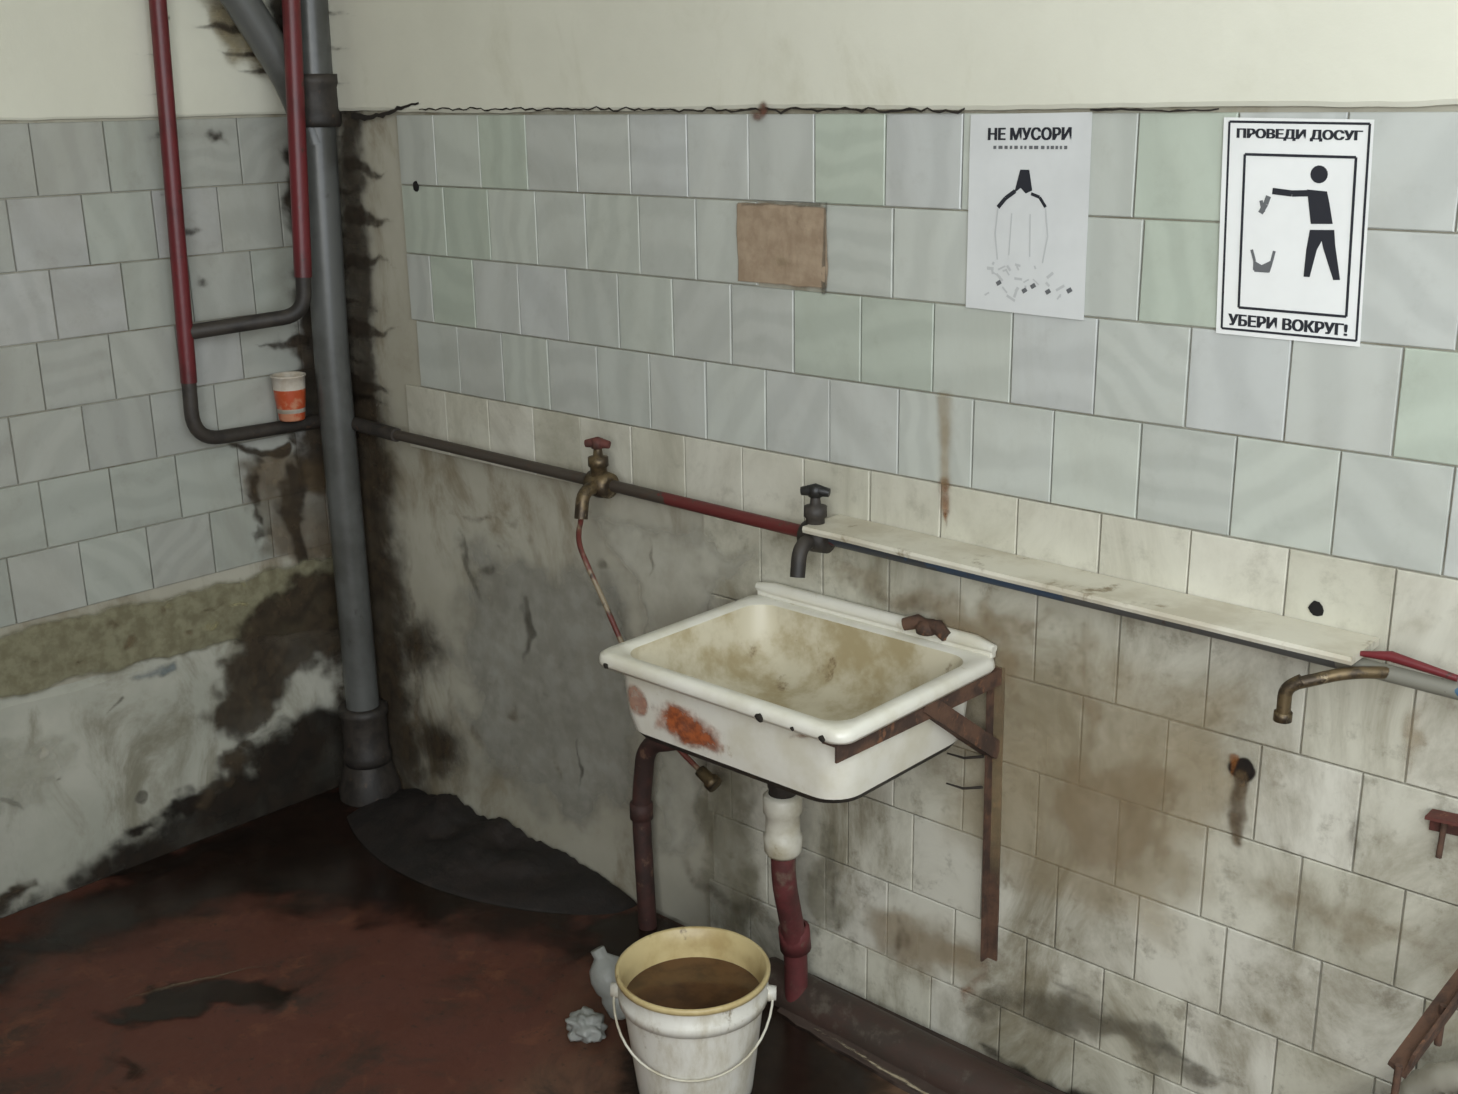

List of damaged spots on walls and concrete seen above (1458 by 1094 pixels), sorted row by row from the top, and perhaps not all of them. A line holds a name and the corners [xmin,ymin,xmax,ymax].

damp [209,2,266,73]
damp [270,0,283,33]
damp [283,149,292,230]
peeling [737,203,828,294]
peeling [598,519,751,634]
peeling [0,558,334,698]
damp [0,290,680,990]
peeling [463,543,634,821]
peeling [656,750,706,853]
damp [619,1051,640,1094]
damp [751,1002,886,1094]
damp [1026,994,1173,1051]